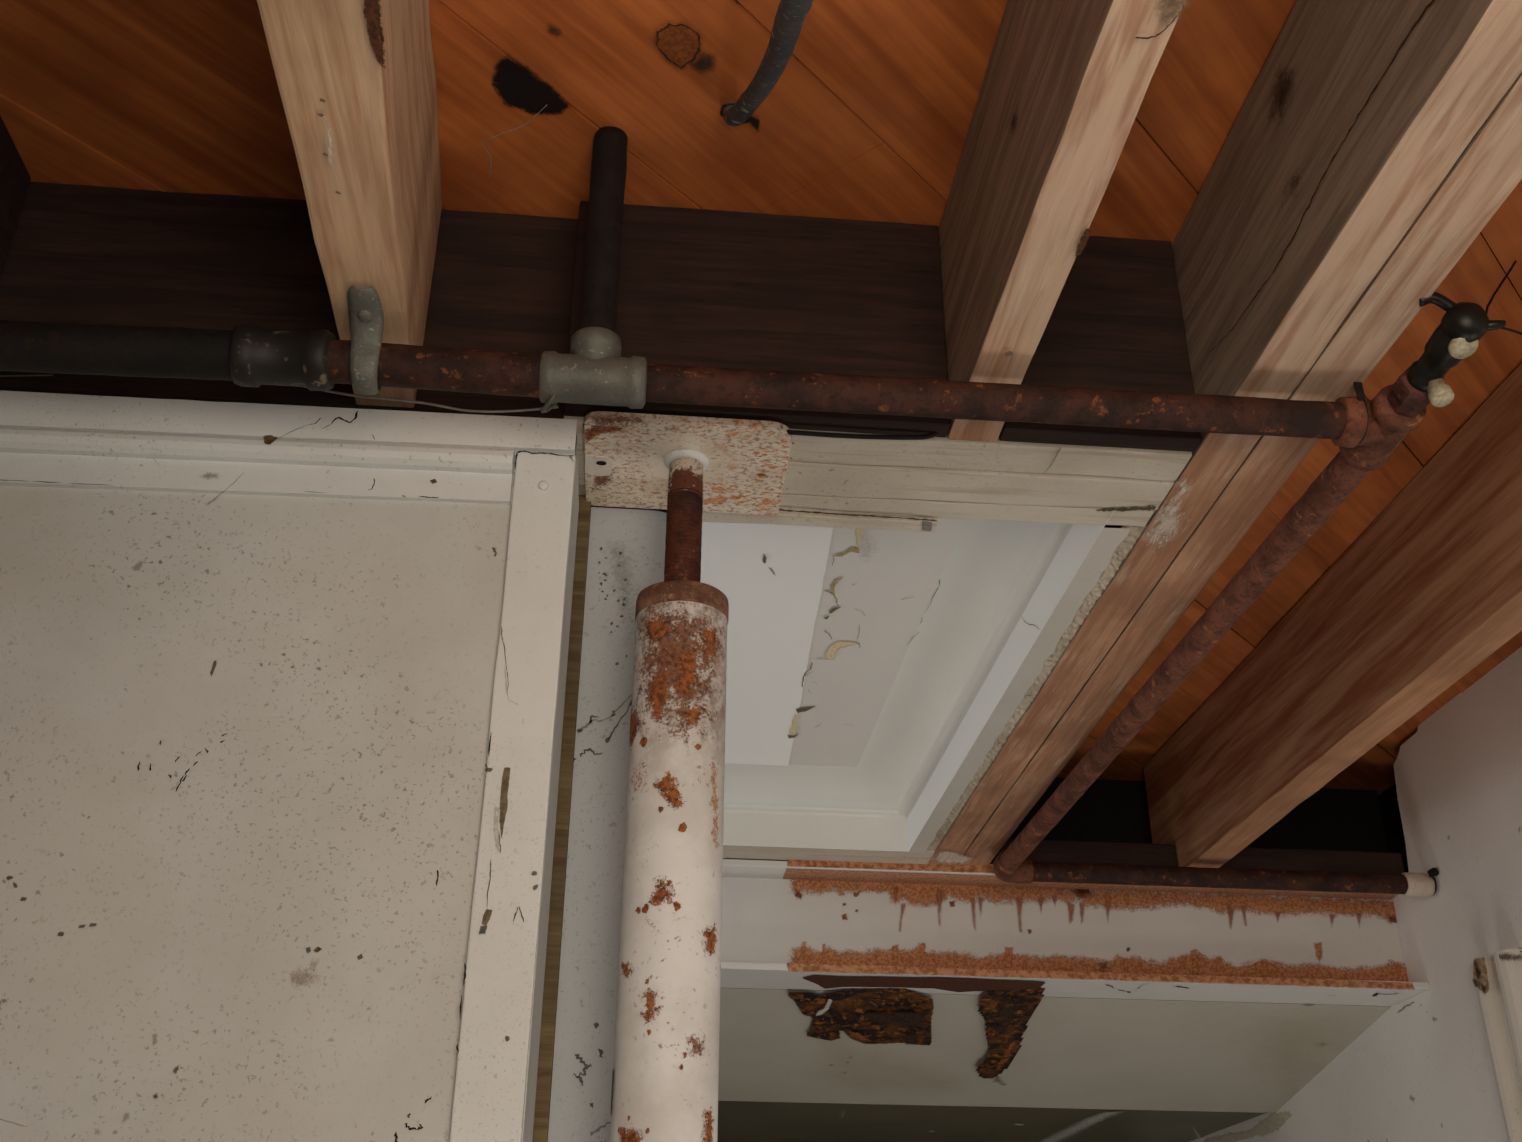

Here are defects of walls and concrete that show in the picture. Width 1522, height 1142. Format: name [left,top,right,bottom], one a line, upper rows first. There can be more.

rust [583,413,644,442]
peeling [817,529,865,660]
rust [629,600,723,832]
peeling [788,706,816,738]
rust [635,876,681,925]
rust [701,923,717,957]
rust [783,859,1415,990]
rust [621,962,663,1035]
rust [679,1036,705,1070]
spalling [775,975,1045,1079]
rust [610,1069,650,1142]
rust [702,1107,715,1142]